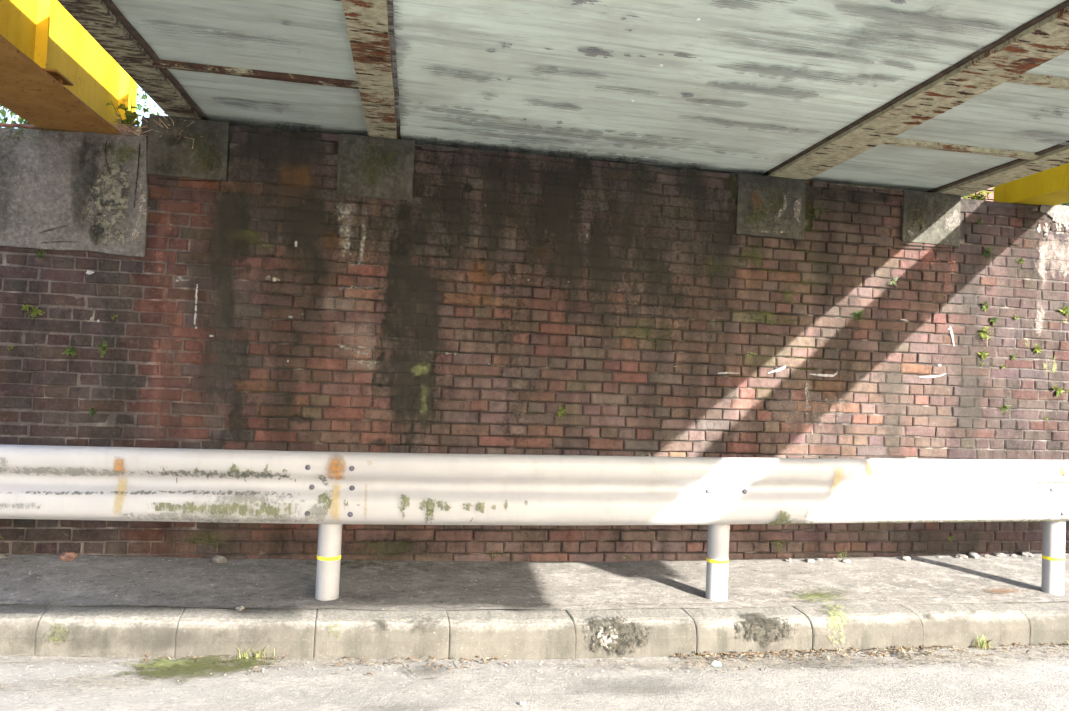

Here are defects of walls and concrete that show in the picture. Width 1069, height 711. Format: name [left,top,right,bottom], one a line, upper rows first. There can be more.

damp [712,0,826,18]
damp [387,0,410,126]
damp [687,5,1007,107]
damp [80,141,109,203]
damp [427,105,756,173]
damp [685,116,822,135]
damp [305,193,367,281]
damp [338,192,446,429]